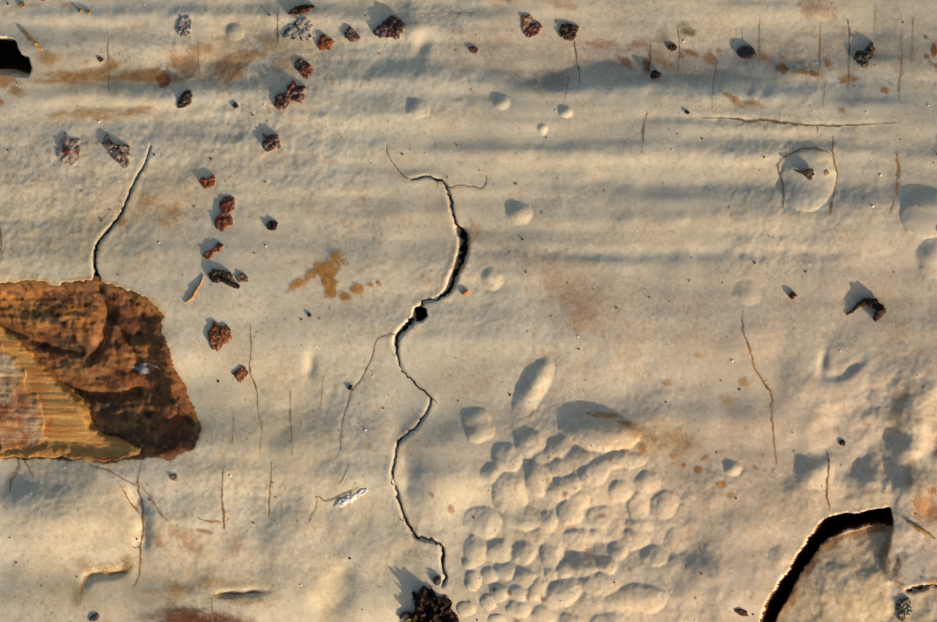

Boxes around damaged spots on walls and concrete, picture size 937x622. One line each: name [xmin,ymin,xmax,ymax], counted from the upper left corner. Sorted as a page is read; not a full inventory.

crack [93,149,150,276]
peeling [0,275,201,463]
crack [340,146,487,584]
peeling [896,598,913,622]
crack [908,584,937,592]